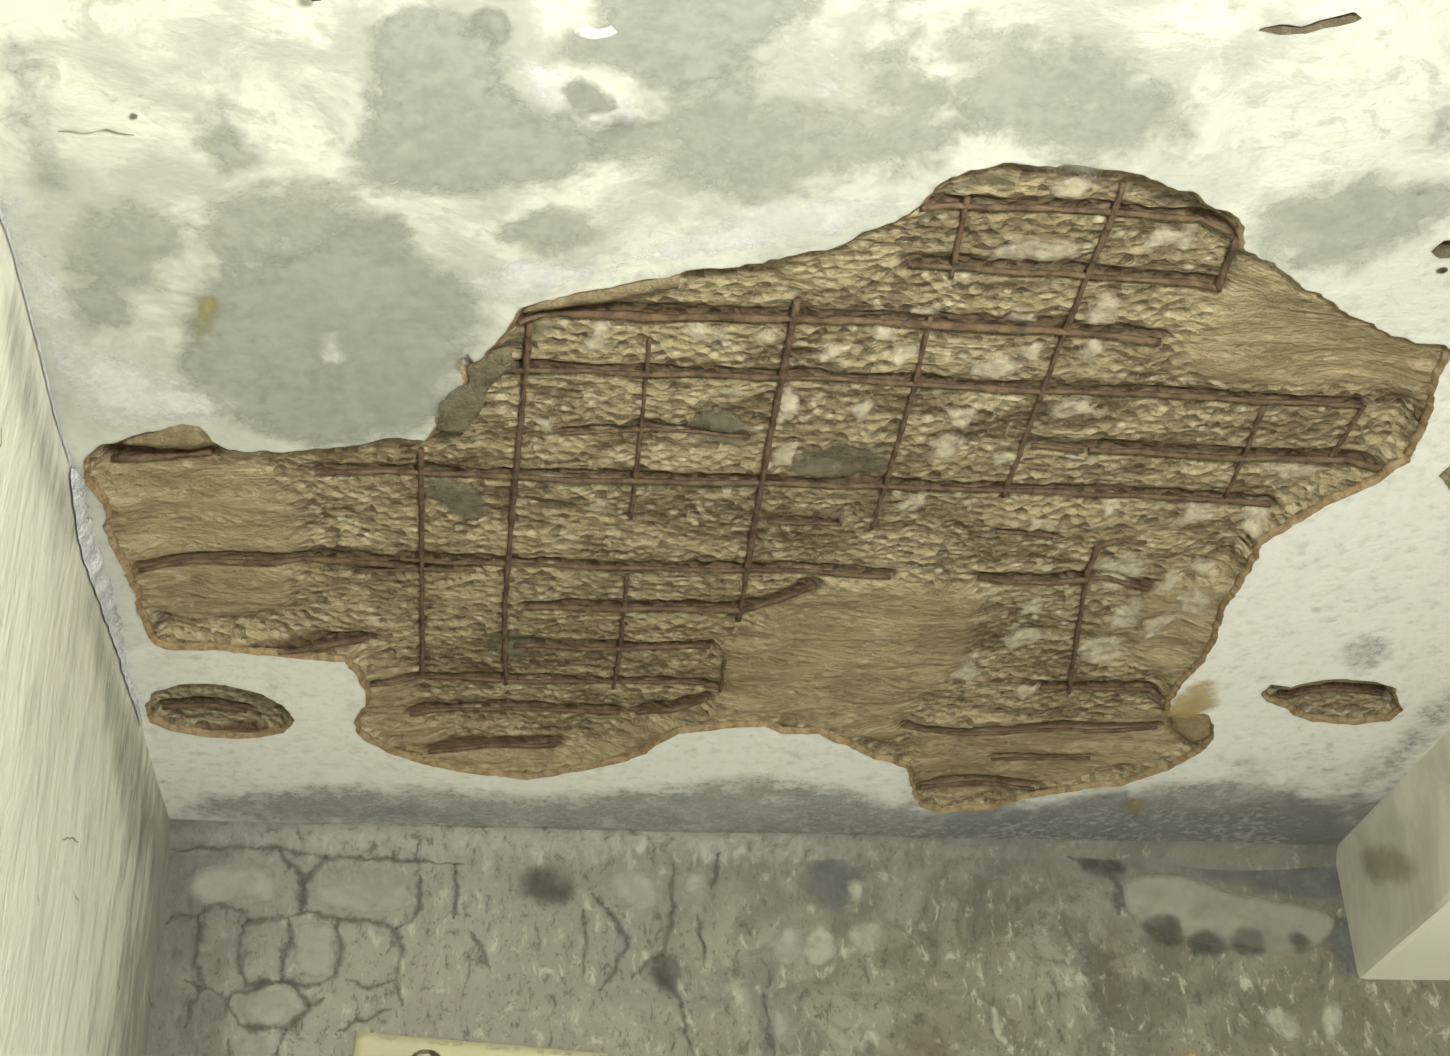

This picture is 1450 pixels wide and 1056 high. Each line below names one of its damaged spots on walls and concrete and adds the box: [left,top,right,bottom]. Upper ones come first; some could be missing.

leakage [355,0,1188,258]
leakage [30,185,592,447]
spalling [71,163,1450,814]
crack [166,845,486,1056]
crack [582,865,705,1045]